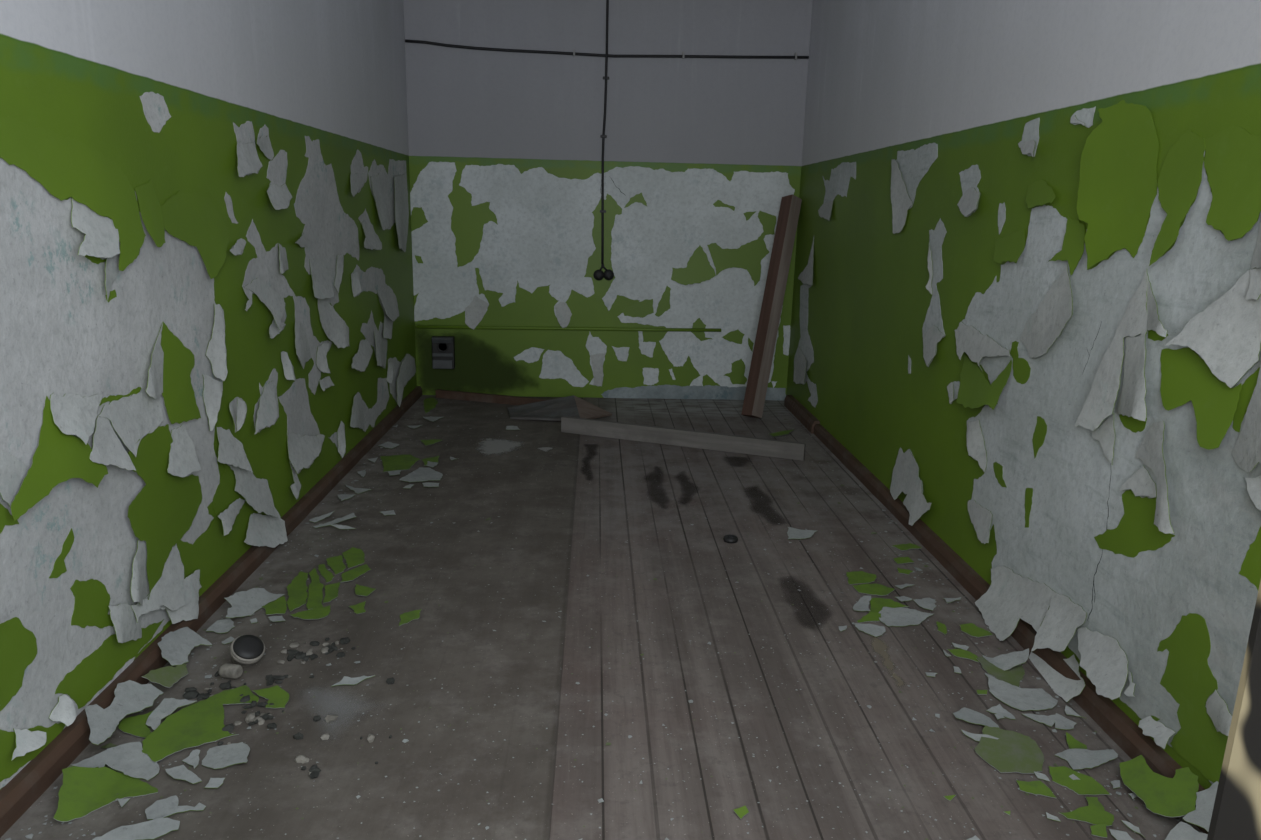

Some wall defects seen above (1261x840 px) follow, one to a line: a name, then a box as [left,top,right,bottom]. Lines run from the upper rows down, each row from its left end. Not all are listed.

peeling [140,92,171,133]
peeling [818,162,856,221]
peeling [891,143,938,234]
peeling [765,238,818,407]
peeling [0,116,795,789]
peeling [890,447,932,526]
peeling [908,100,1261,784]